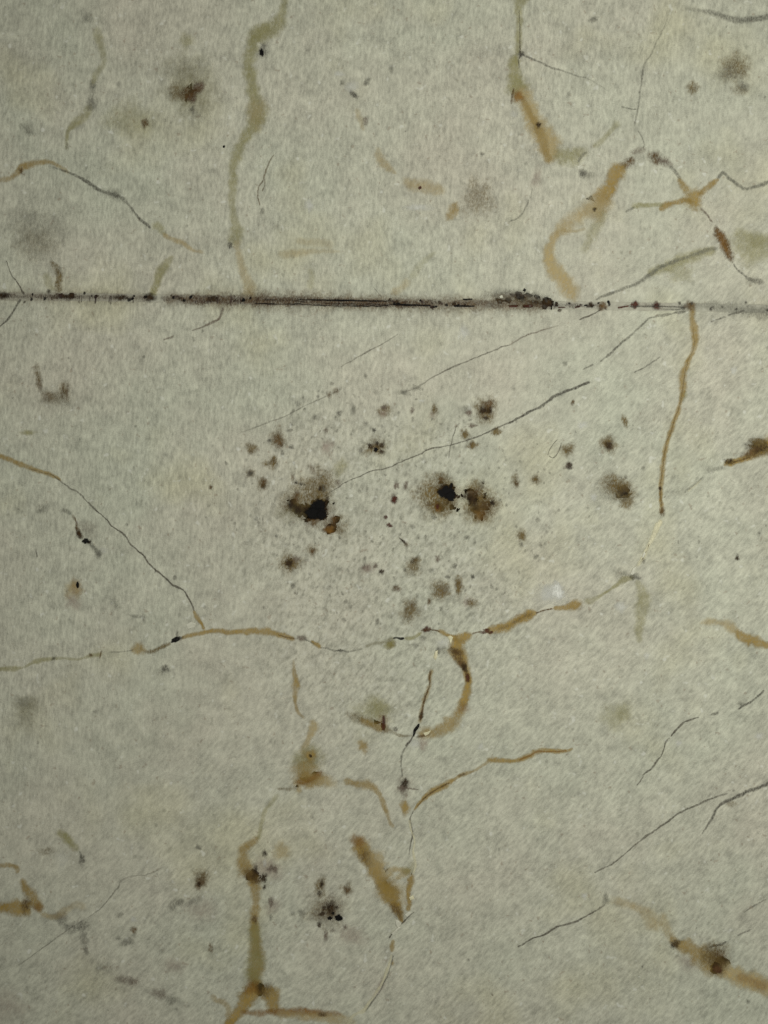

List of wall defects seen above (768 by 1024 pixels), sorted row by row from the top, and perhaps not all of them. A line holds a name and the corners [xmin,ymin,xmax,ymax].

crack [580,260,678,320]
leakage [462,400,501,448]
crack [0,455,60,480]
leakage [284,467,342,533]
leakage [420,474,496,520]
leakage [605,475,632,508]
crack [64,510,343,653]
leakage [428,575,474,604]
crack [387,601,580,745]
crack [617,783,768,861]
leakage [318,903,343,938]
crack [348,779,416,1023]